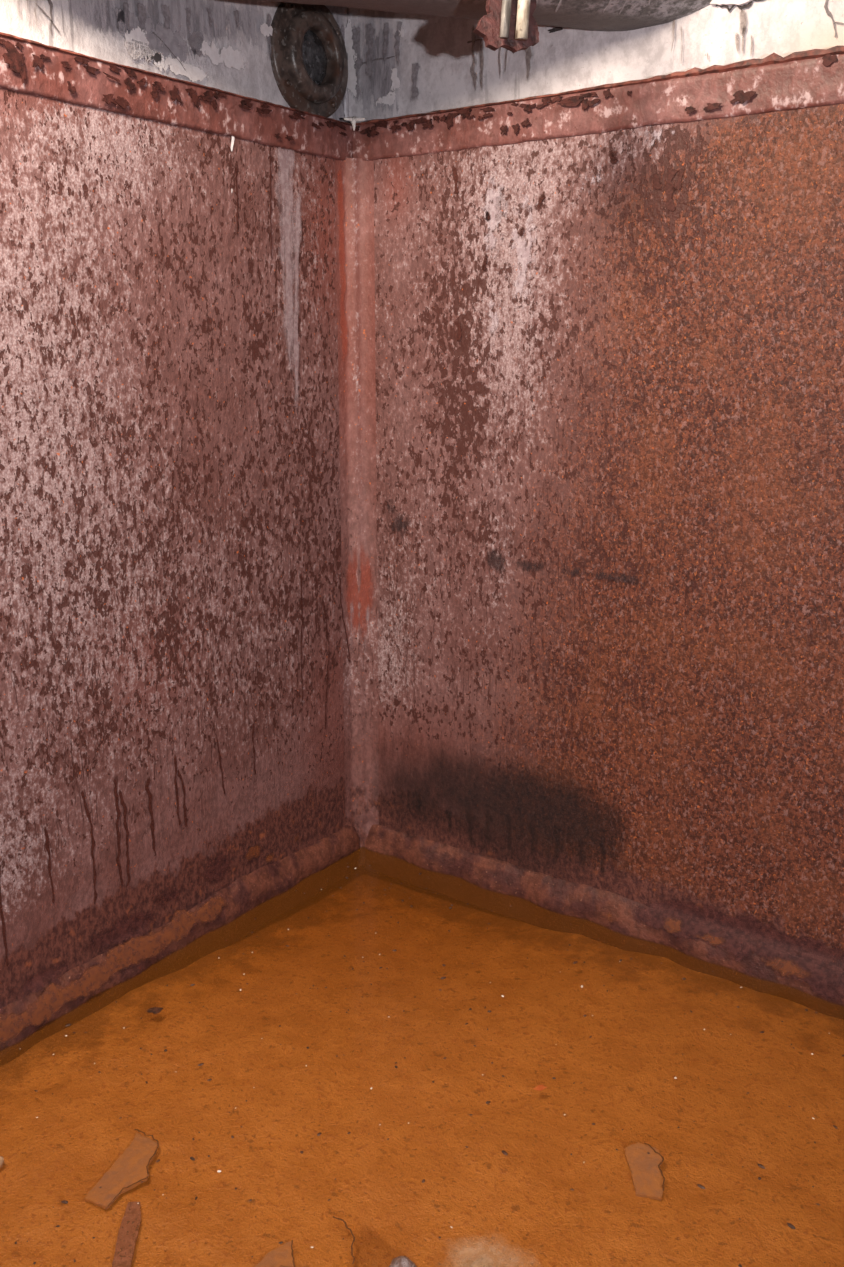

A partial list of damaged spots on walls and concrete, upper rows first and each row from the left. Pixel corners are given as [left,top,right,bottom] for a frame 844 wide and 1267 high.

crack [716,0,763,12]
crack [824,0,844,38]
corrosion [0,39,226,109]
corrosion [289,89,632,137]
corrosion [685,90,756,114]
corrosion [822,54,838,66]
efflorescence [278,148,301,395]
corrosion [81,791,97,904]
corrosion [114,779,130,887]
corrosion [174,755,187,826]
leakage [393,759,615,863]
corrosion [0,896,226,1043]